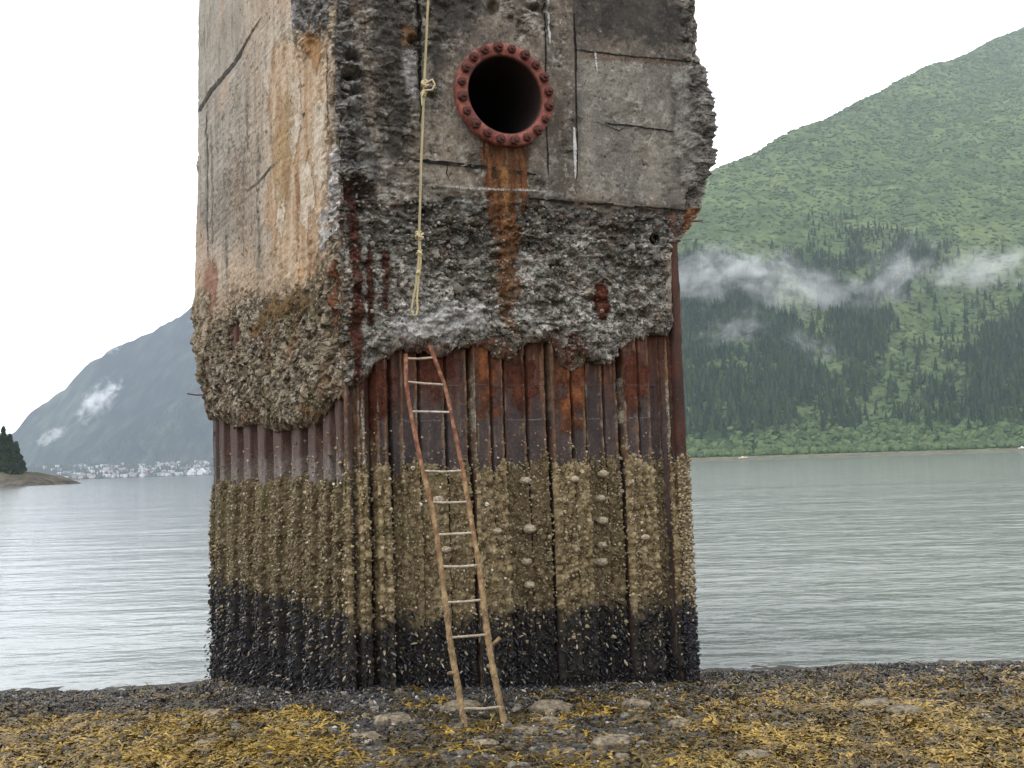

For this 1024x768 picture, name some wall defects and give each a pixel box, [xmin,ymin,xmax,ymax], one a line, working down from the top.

crack [198,16,262,251]
rust [252,92,399,437]
rust [415,350,461,402]
spalling [201,0,706,433]
rust [480,139,532,332]
rust [466,345,585,436]
crack [540,0,548,72]
crack [413,13,699,212]
rust [590,282,611,323]
spalling [693,67,709,86]